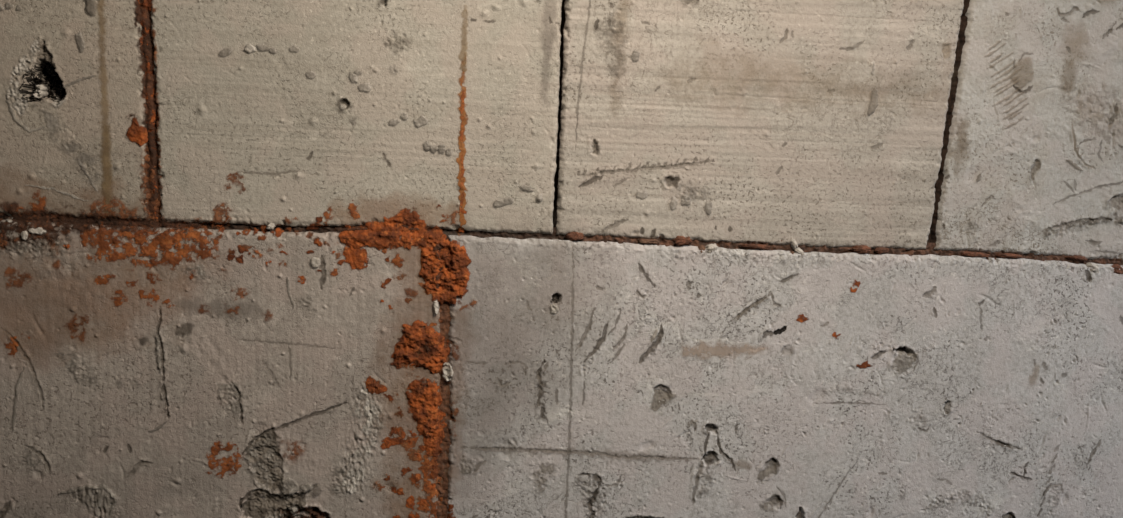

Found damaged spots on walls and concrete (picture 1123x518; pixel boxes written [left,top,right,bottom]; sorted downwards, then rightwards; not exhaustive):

spalling [6,40,97,176]
rust [0,0,477,518]
spalling [239,388,382,518]